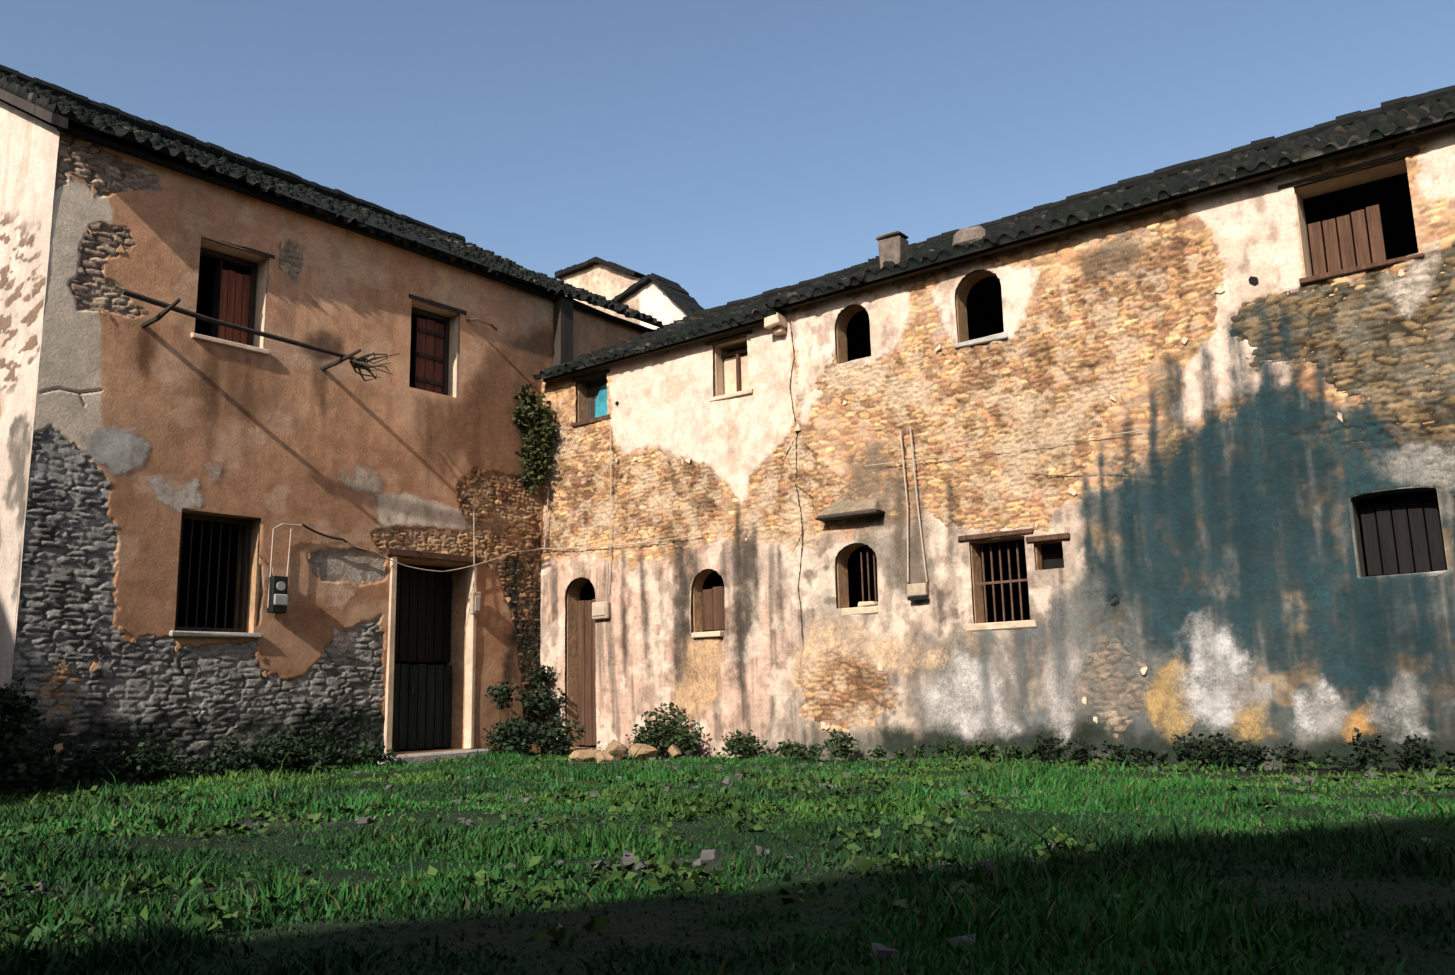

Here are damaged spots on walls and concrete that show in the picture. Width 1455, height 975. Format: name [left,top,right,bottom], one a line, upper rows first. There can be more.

flaking render [55,132,162,197]
peeling [0,213,45,390]
flaking render [68,221,147,319]
flaking render [278,239,306,282]
flaking render [815,228,1455,535]
flaking render [0,412,385,791]
flaking render [307,420,723,721]
water stain [673,542,696,689]
water stain [731,509,758,687]